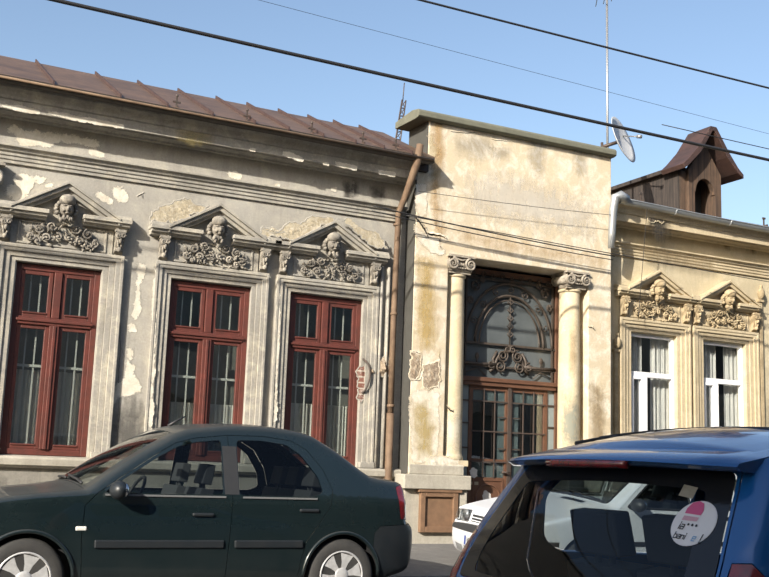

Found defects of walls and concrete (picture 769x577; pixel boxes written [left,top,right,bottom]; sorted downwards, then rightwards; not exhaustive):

peeling [0,104,125,129]
peeling [6,123,106,158]
peeling [2,173,54,201]
peeling [95,185,129,204]
flaking render [149,197,210,224]
peeling [113,262,159,430]
peeling [408,352,464,466]